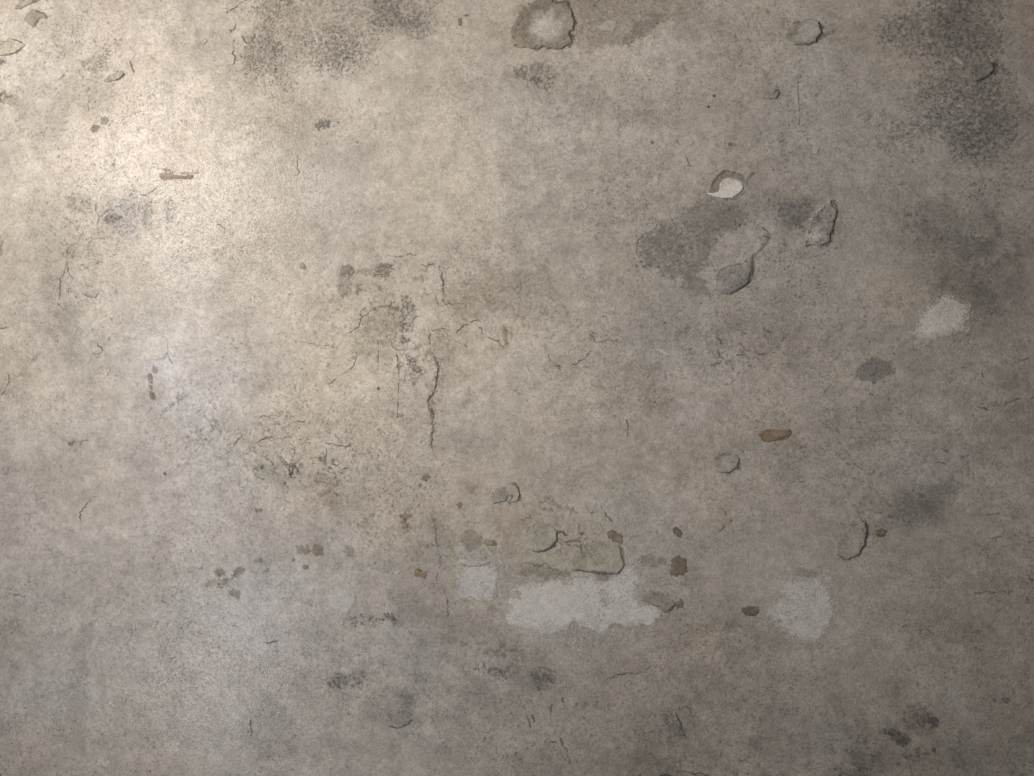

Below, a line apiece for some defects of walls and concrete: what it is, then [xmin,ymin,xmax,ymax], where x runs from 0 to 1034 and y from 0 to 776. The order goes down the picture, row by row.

spalling [510,0,577,50]
leakage [868,0,1033,165]
leakage [635,197,747,281]
crack [330,299,399,418]
crack [385,246,503,458]